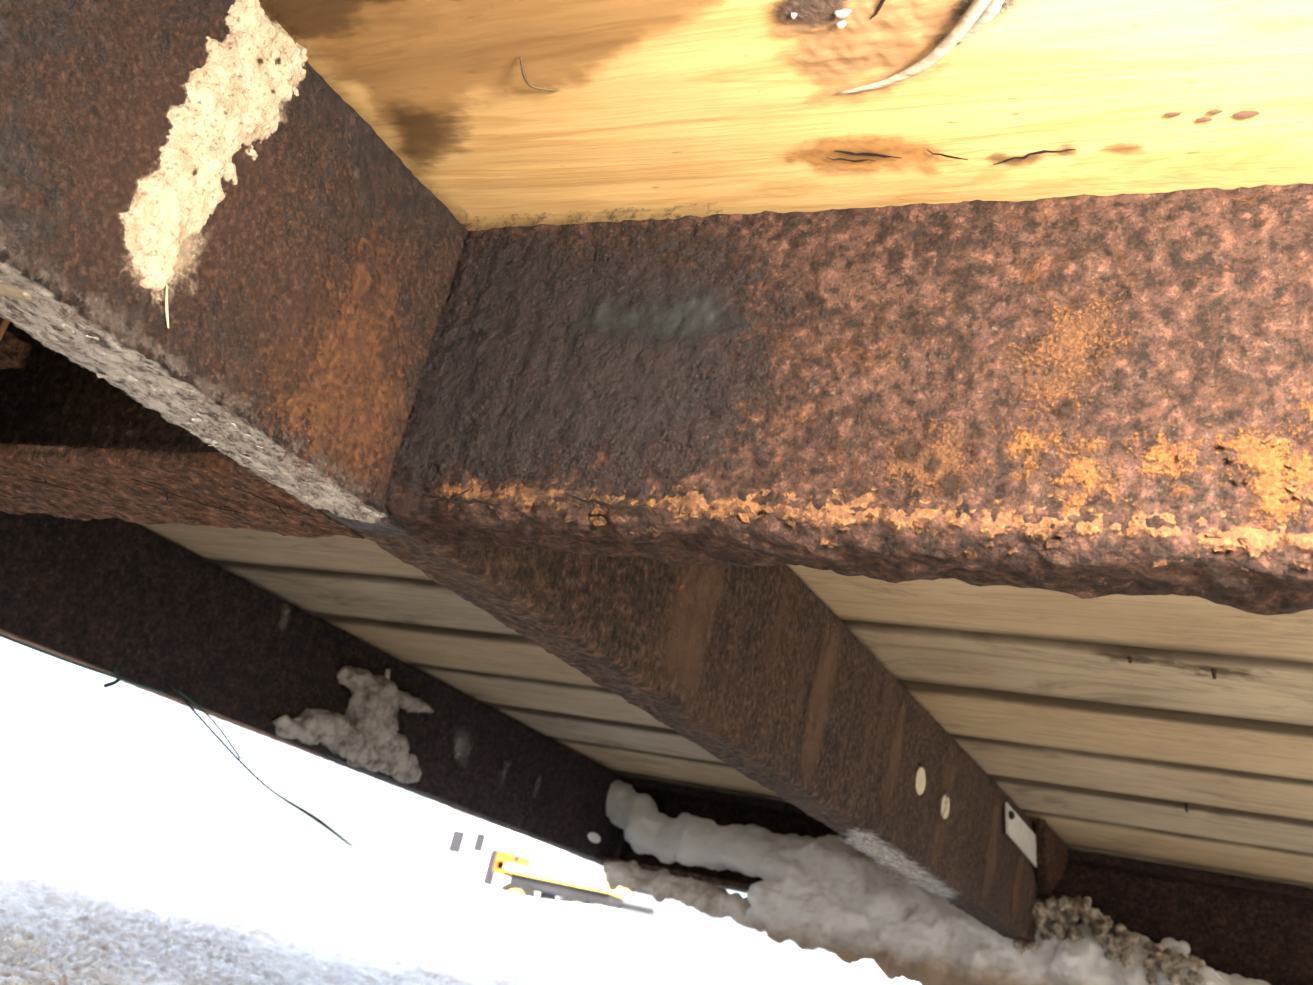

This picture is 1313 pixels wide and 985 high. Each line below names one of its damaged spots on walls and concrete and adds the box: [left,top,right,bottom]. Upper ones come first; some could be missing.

damp [263,0,390,38]
damp [393,110,457,165]
crack [992,148,1076,165]
crack [1108,144,1139,152]
corrosion [0,0,467,499]